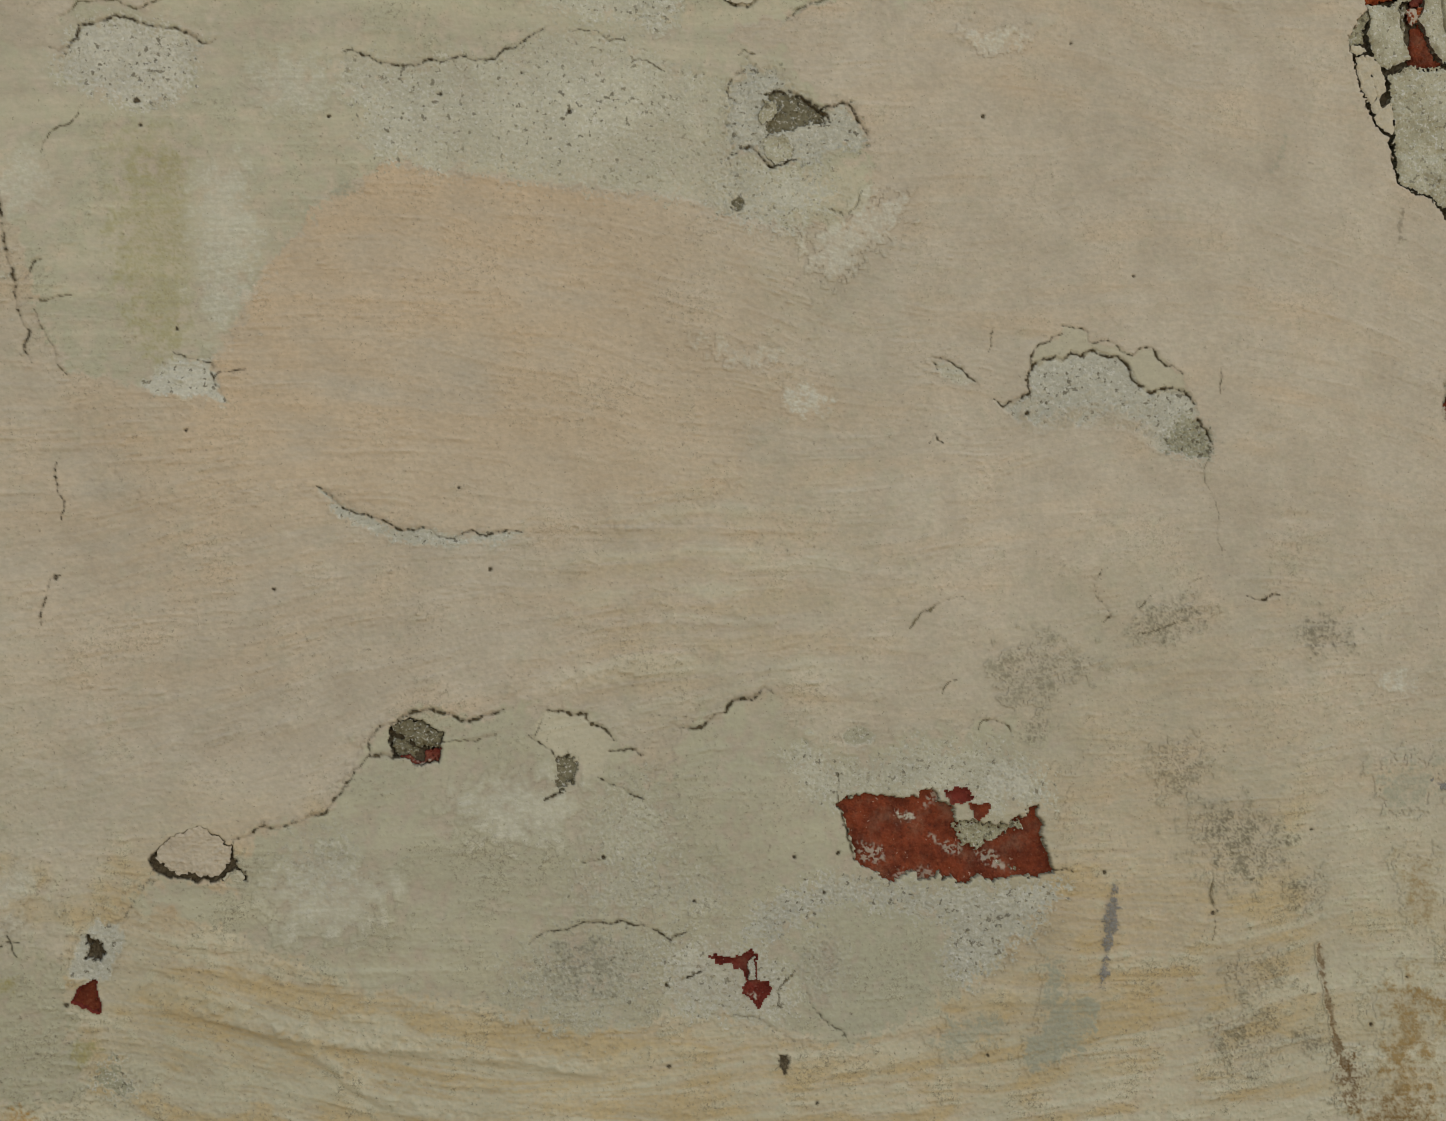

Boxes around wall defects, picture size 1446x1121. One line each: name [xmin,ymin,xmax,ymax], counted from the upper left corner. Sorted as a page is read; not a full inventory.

spalling [1349,0,1446,220]
peeling [0,0,875,410]
flaking render [923,358,980,387]
spalling [991,323,1224,469]
crack [317,486,507,539]
crack [231,709,504,845]
crack [535,710,642,801]
crack [690,692,760,729]
peeling [0,688,1087,1121]